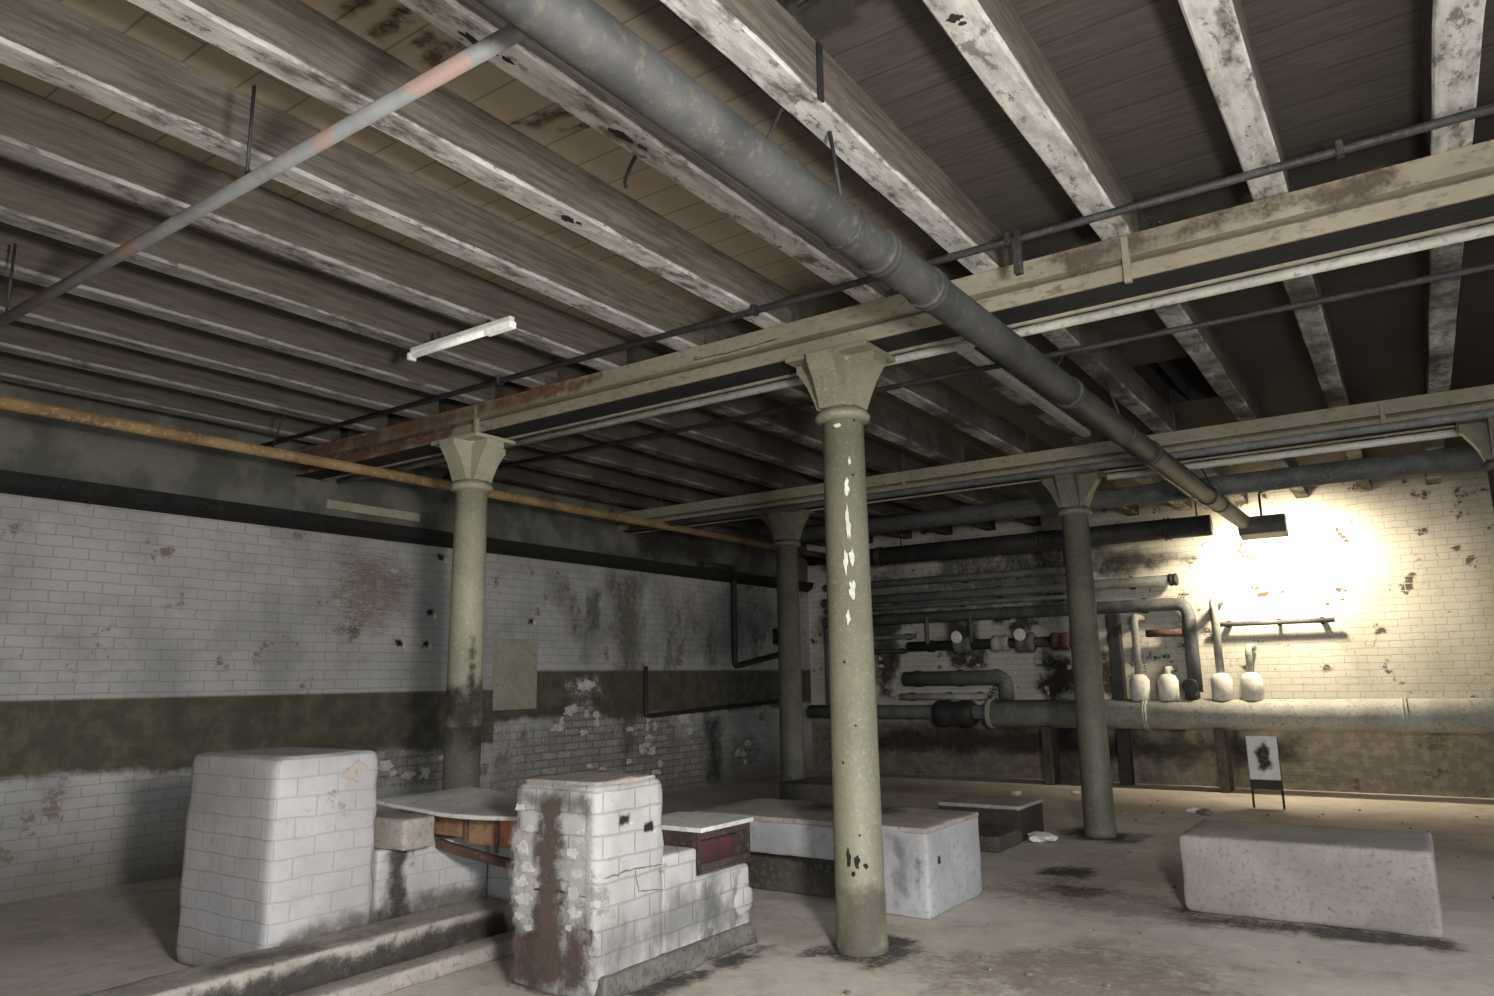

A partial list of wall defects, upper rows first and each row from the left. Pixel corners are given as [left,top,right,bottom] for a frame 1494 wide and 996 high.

corrosion [297,375,602,475]
leakage [510,909,571,989]